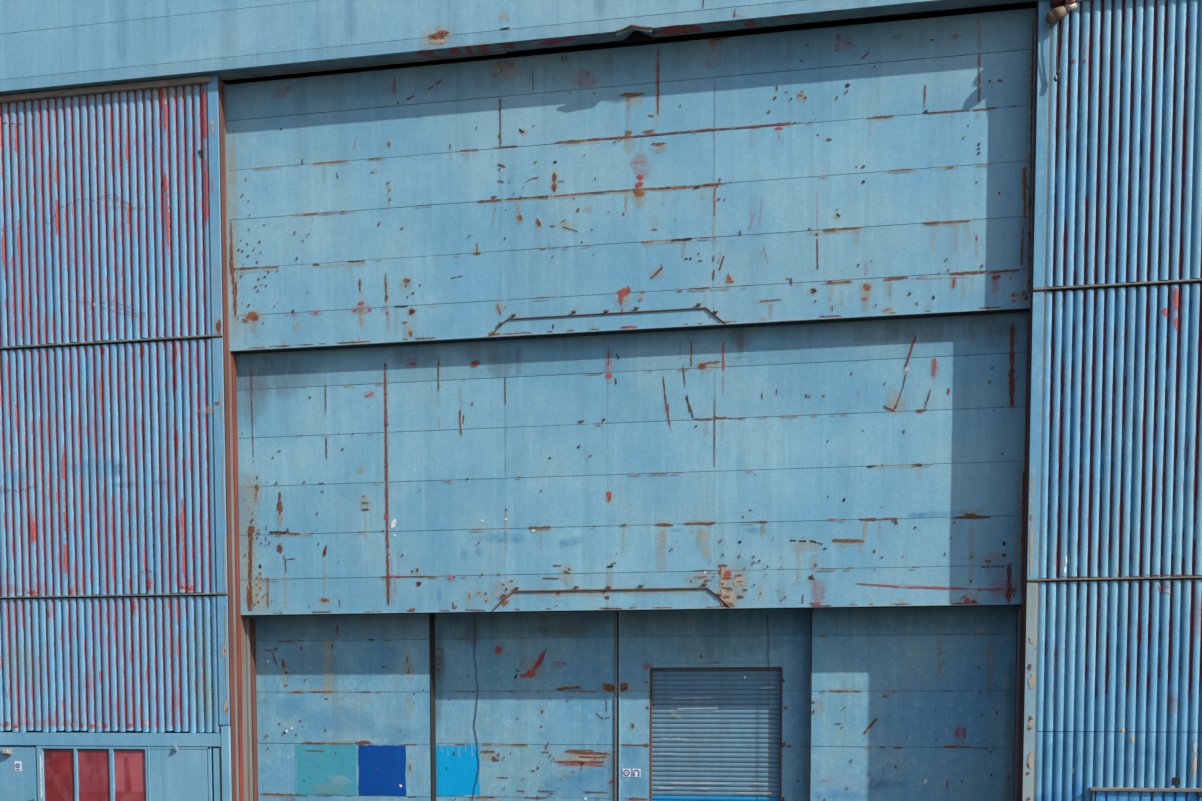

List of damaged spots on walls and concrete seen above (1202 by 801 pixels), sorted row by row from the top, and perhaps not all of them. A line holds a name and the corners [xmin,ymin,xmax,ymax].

rust [655,10,755,114]
rust [554,122,812,143]
rust [477,178,727,216]
rust [353,274,436,340]
rust [679,342,725,370]
rust [365,364,439,613]
rust [247,519,315,612]
peeling [690,539,782,605]
peeling [790,533,883,570]
peeling [499,649,546,679]
peeling [496,691,608,799]